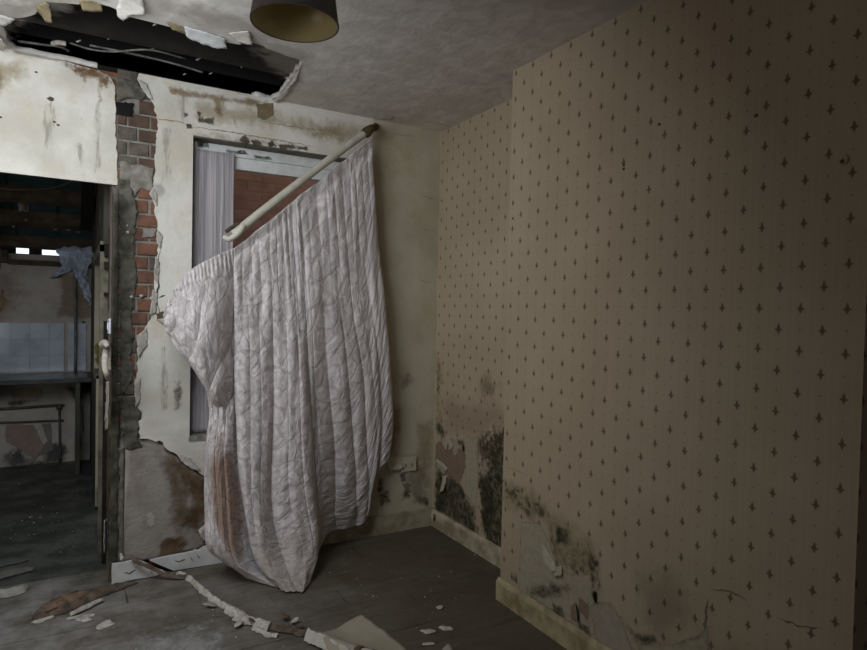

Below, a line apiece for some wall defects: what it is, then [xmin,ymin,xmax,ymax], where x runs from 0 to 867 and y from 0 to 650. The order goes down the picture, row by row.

flaking render [184,111,213,129]
flaking render [98,69,205,581]
peeling [436,459,448,492]
leakage [400,428,598,580]
peeling [519,522,595,635]